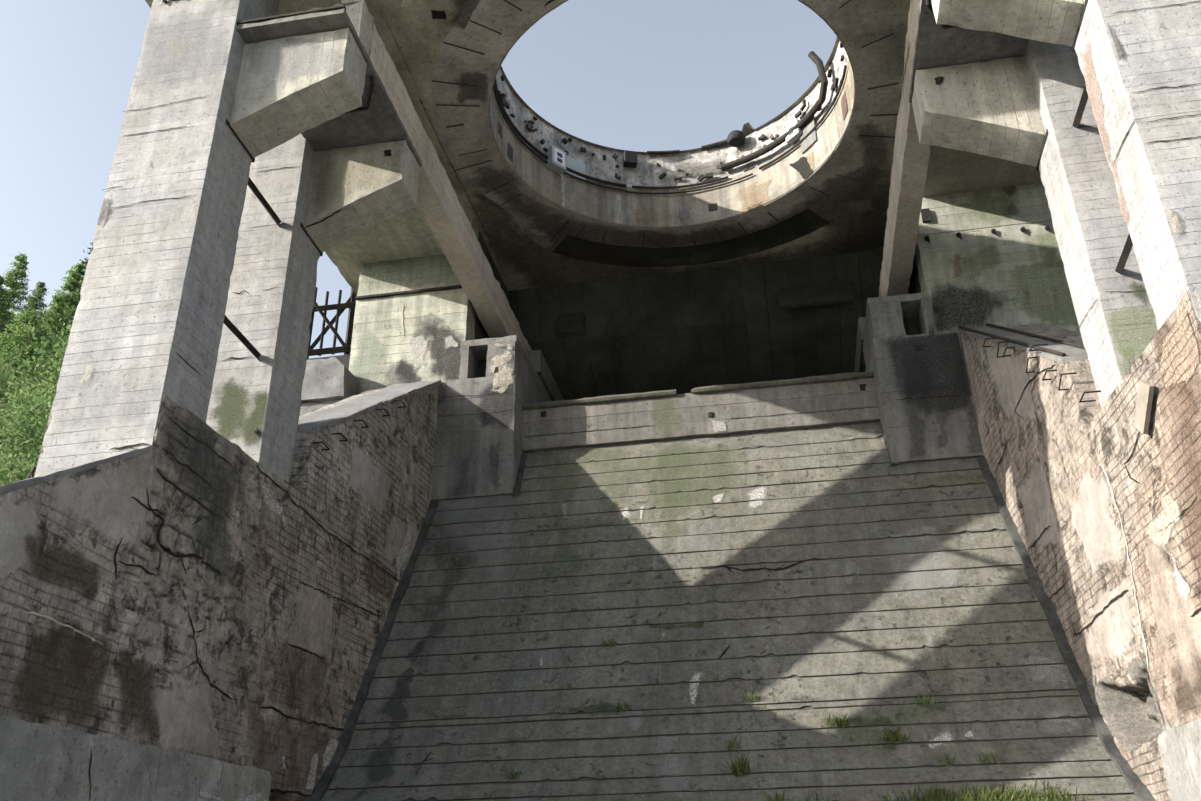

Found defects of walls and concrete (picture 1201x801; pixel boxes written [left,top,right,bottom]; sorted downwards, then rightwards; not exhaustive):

spalling [489,343,514,393]
water stain [26,537,98,599]
crack [677,558,822,582]
crack [1073,432,1151,678]
crack [1160,496,1197,531]
water stain [15,623,160,742]
water stain [358,640,425,796]
spalling [1087,659,1165,753]